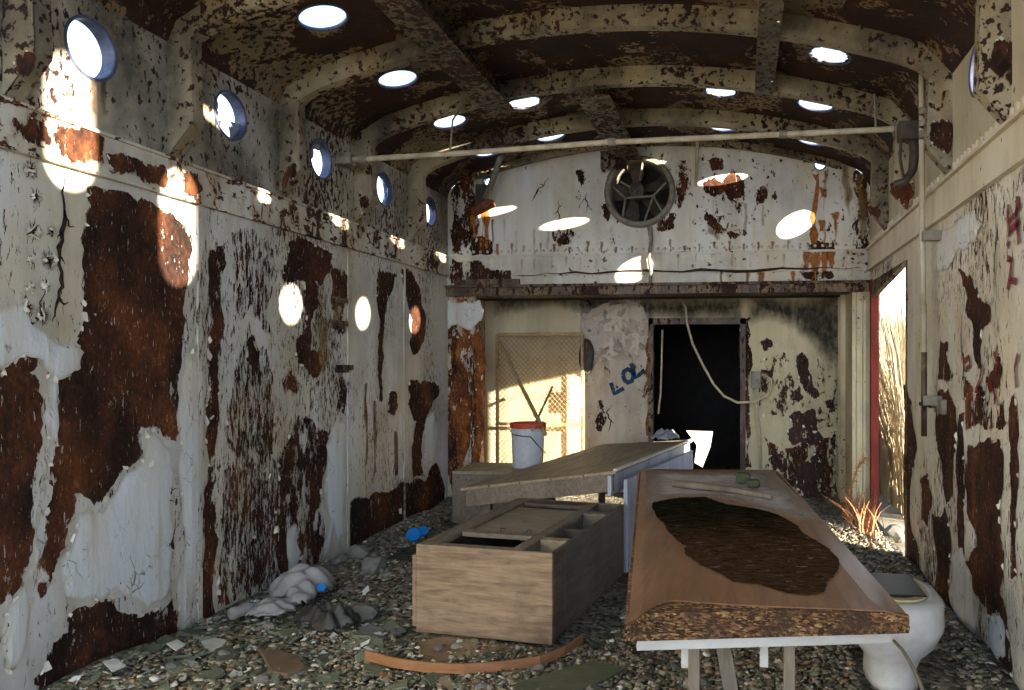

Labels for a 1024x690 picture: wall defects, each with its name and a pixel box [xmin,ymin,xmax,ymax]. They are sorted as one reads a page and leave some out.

crack [23,159,74,325]
rust [12,117,168,187]
rust [449,175,512,284]
rust [788,161,881,281]
rust [0,186,193,604]
peeling [60,344,205,631]
rust [350,268,486,546]
peeling [580,299,652,451]
rust [738,318,838,498]
rust [902,268,1019,678]